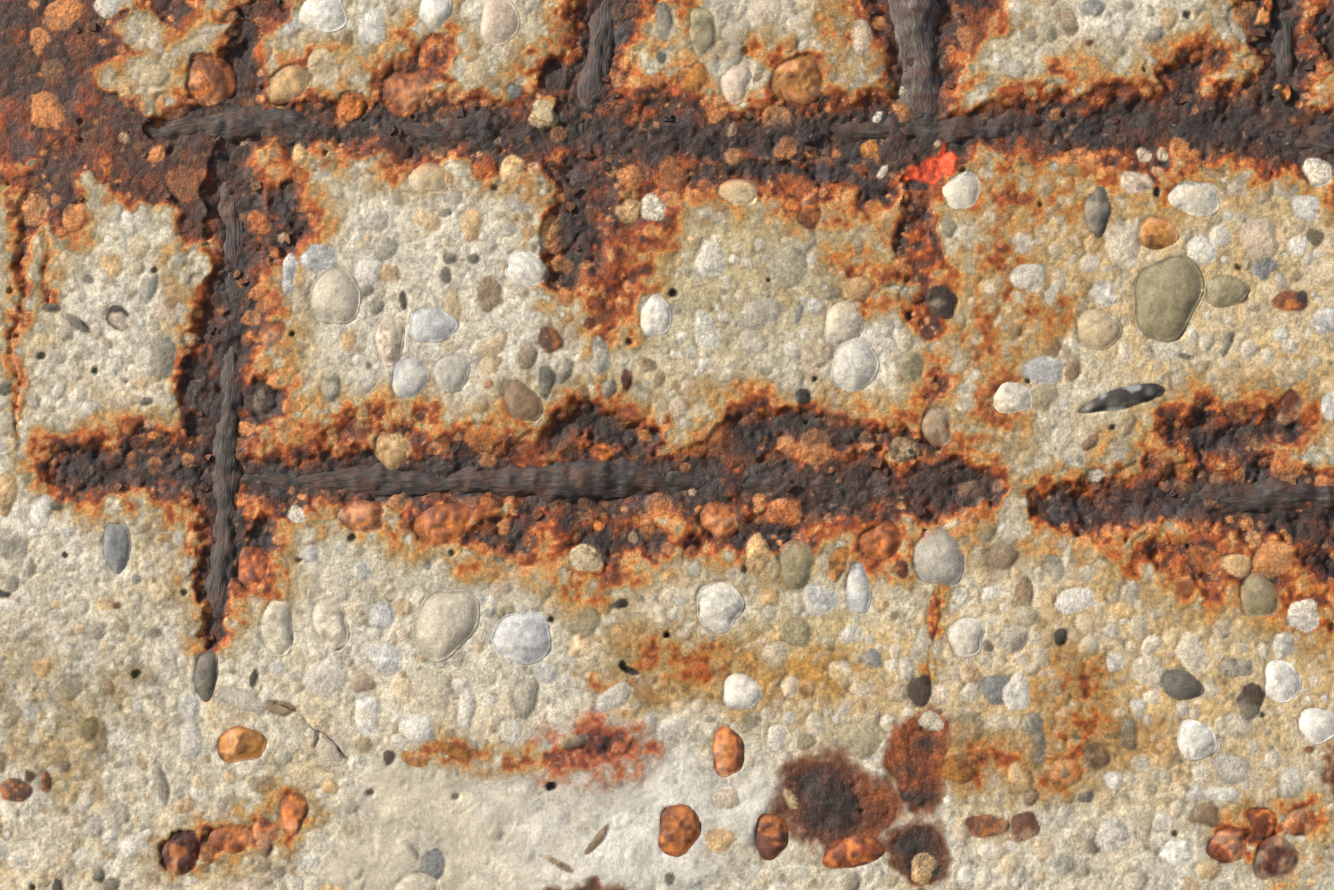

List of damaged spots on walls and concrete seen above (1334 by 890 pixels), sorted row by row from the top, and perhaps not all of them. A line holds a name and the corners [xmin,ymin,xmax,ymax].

corrosion [90,0,251,121]
corrosion [258,0,577,124]
corrosion [620,0,892,118]
corrosion [948,0,1258,115]
spalling [0,0,1334,650]
corrosion [0,142,1334,661]
corrosion [919,582,951,684]
corrosion [139,779,329,882]
corrosion [419,625,760,787]
corrosion [574,876,623,890]
corrosion [772,647,1129,887]
corrosion [1200,745,1334,890]